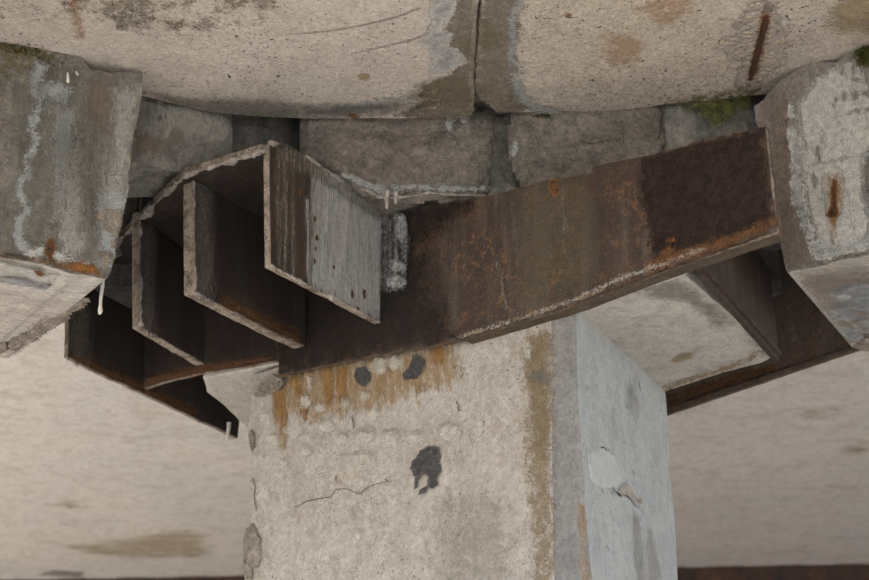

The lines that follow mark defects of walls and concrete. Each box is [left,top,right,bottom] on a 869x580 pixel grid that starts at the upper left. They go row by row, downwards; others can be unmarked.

water stain [306,0,564,132]
corrosion [0,237,102,277]
water stain [0,59,232,304]
water stain [770,58,869,341]
corrosion [821,172,845,243]
corrosion [272,344,463,448]
crack [284,473,410,514]
peeling [588,447,642,507]